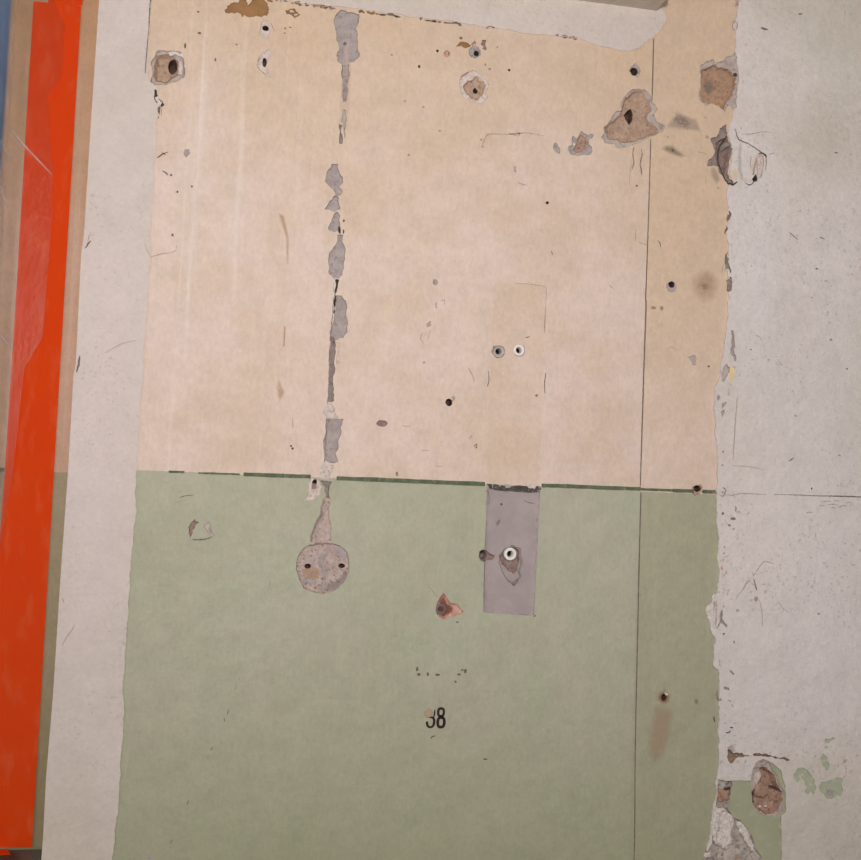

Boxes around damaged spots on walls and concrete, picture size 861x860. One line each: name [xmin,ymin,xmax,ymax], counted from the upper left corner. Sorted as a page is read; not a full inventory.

peeling [225,0,336,34]
spalling [459,63,491,104]
spalling [698,52,739,112]
spalling [553,89,665,156]
spalling [707,124,738,186]
peeling [793,737,846,799]
peeling [703,759,786,860]